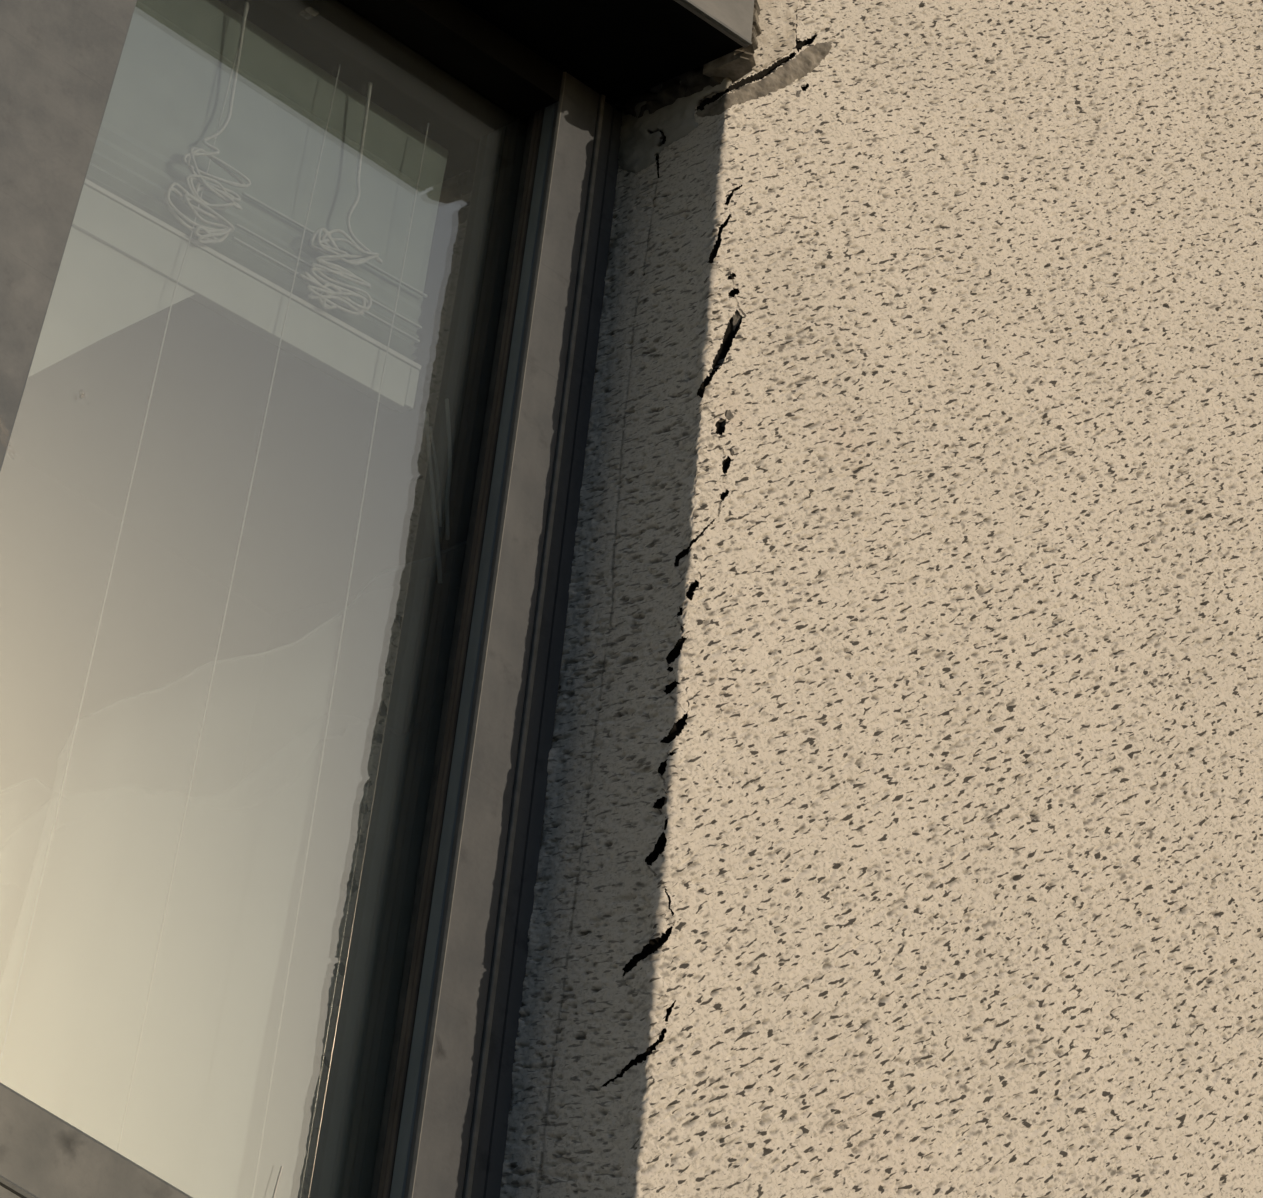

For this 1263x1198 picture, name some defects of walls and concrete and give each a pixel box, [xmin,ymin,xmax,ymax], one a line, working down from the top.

crack [697,7,817,111]
peeling [752,0,798,72]
crack [650,130,666,178]
crack [708,184,742,297]
crack [623,410,734,976]
crack [601,994,676,1087]